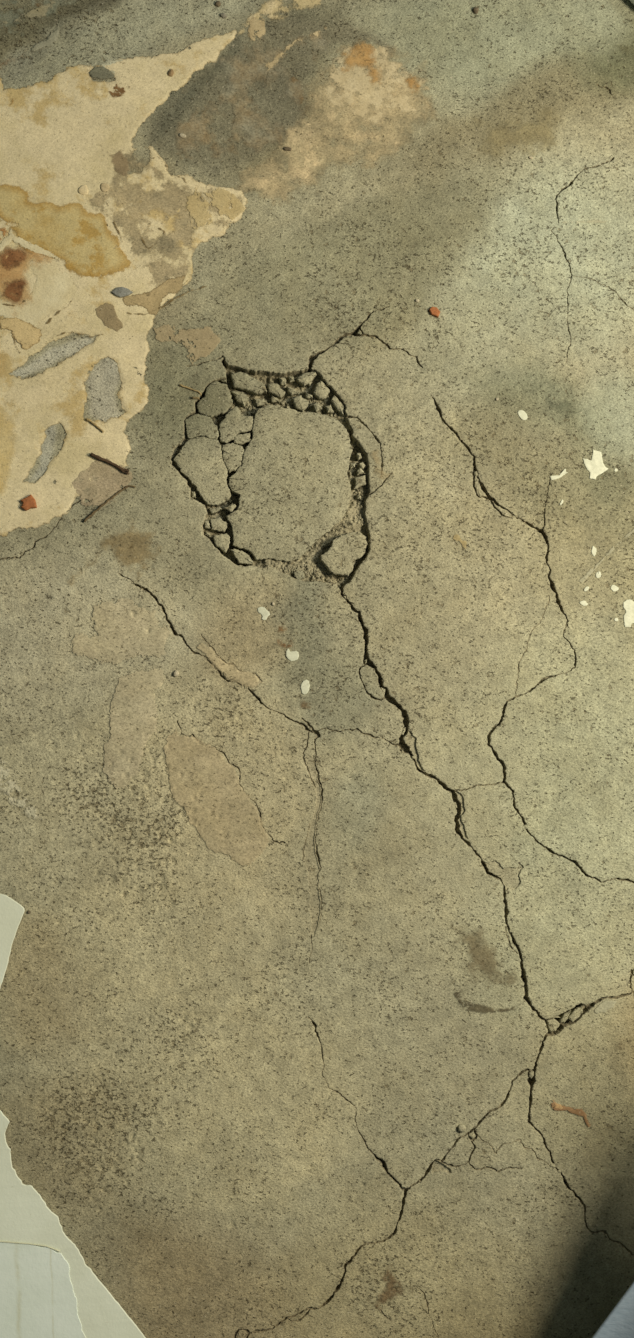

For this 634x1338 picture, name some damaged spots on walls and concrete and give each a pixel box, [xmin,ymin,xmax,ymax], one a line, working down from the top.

peeling [0,0,435,587]
crack [550,157,634,362]
crack [118,306,634,1338]